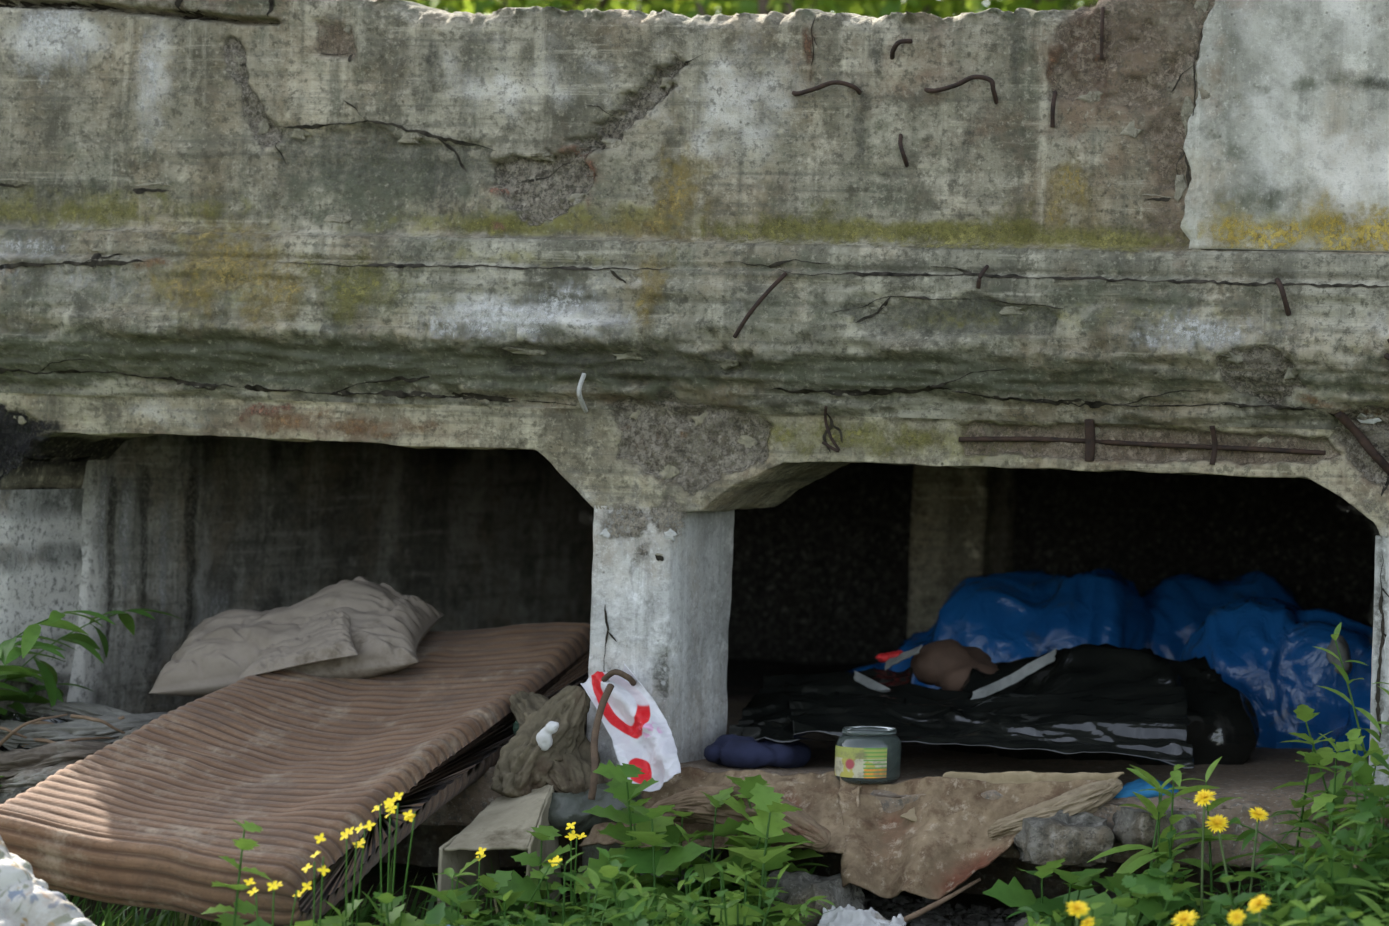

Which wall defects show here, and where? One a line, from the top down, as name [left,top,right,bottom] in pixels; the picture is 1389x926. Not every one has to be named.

crack [275,101,496,172]
spalling [223,37,686,226]
crack [518,54,703,183]
peeling [1050,0,1214,249]
leakage [152,228,302,314]
spalling [0,404,34,478]